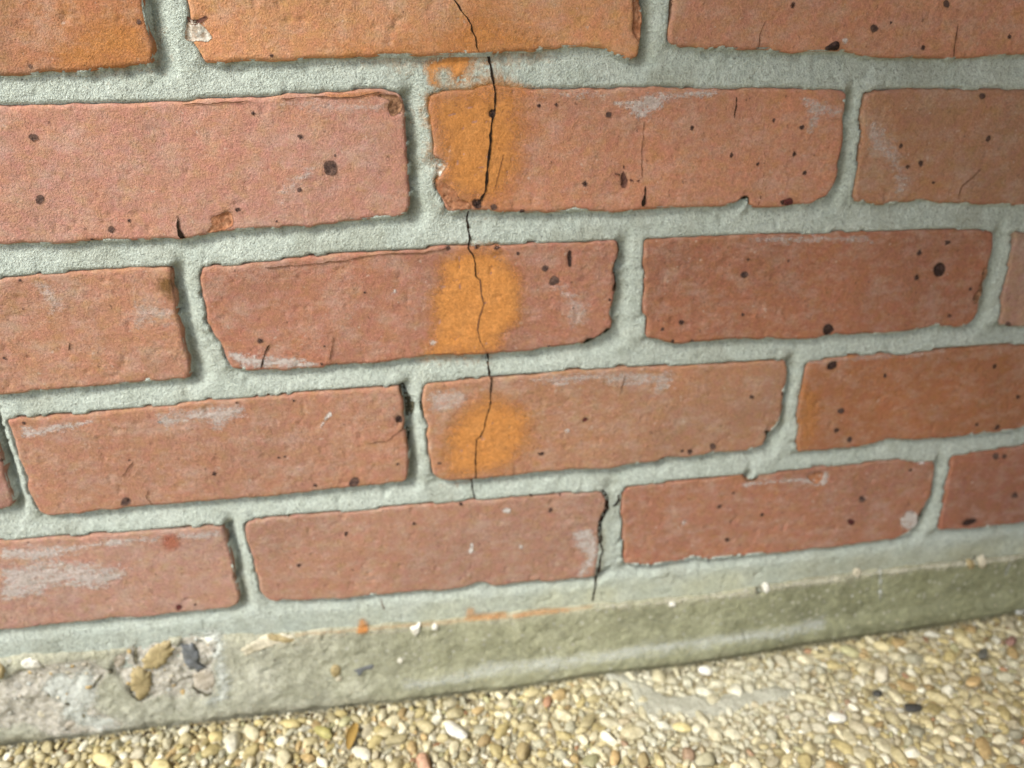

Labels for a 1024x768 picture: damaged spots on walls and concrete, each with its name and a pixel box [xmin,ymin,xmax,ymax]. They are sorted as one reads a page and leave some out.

crack [183,99,244,107]
crack [268,0,504,499]
rust [426,252,521,355]
rust [447,399,529,475]
crack [592,490,620,602]
spalling [0,635,218,735]